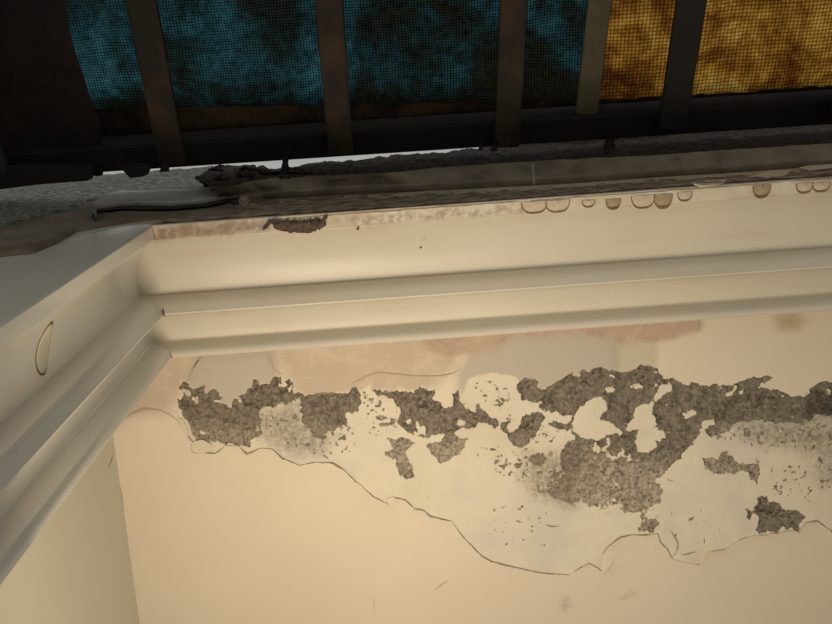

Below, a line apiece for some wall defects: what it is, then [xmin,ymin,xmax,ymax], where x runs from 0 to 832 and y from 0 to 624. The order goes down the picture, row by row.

peeling [159,364,832,575]